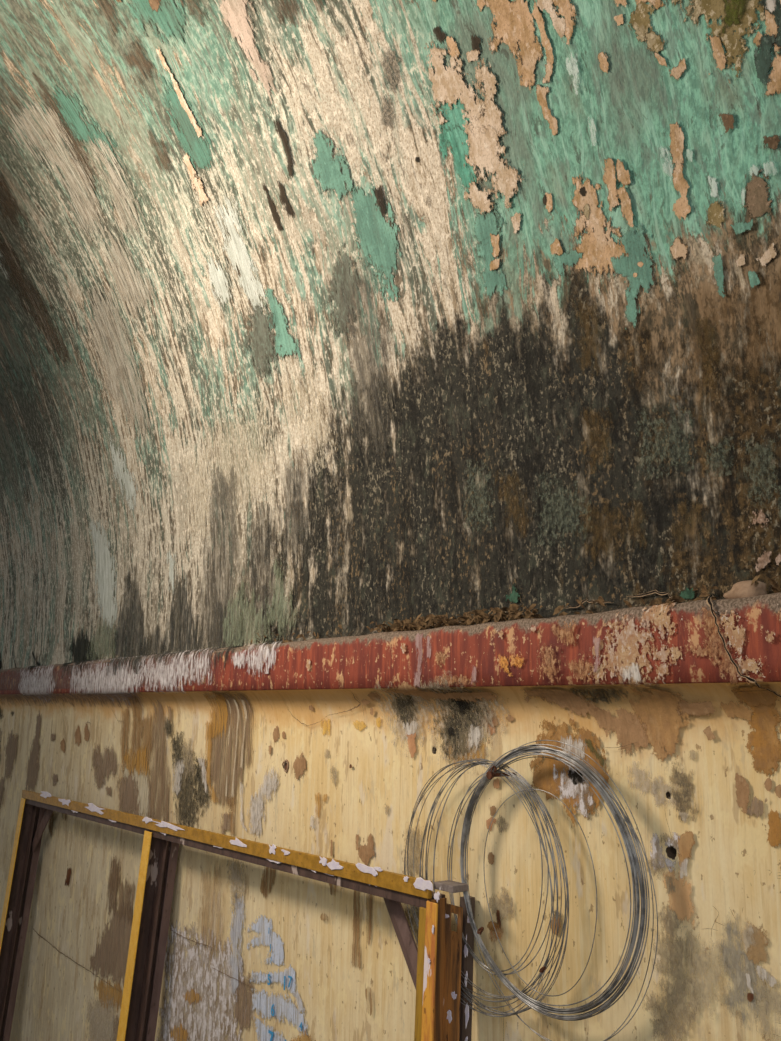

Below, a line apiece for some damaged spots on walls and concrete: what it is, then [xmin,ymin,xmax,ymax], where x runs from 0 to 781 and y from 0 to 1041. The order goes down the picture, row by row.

peeling [614,0,686,80]
peeling [753,0,781,96]
peeling [424,0,576,297]
peeling [550,157,654,329]
peeling [669,122,691,220]
flaking render [705,169,773,235]
peeling [712,243,777,297]
damp [0,261,781,847]
flaking render [755,550,781,572]
crack [706,595,781,697]
peeling [498,602,767,827]
flaking render [646,831,695,925]